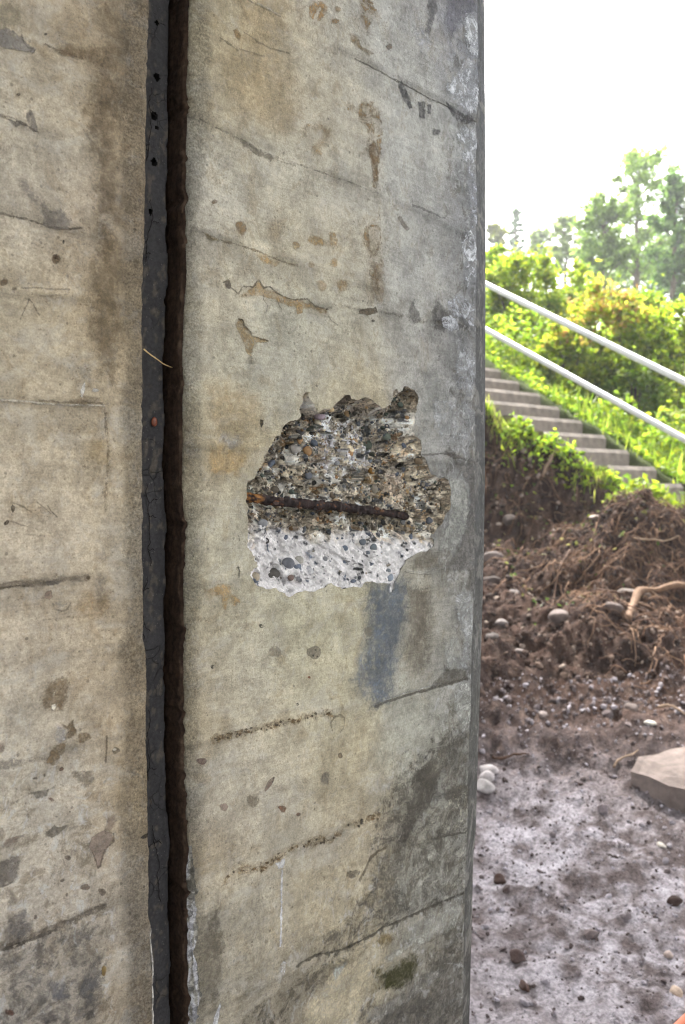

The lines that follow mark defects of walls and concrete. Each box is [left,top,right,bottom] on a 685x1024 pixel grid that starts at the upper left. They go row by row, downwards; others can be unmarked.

peeling [223,280,336,314]
peeling [359,307,377,322]
peeling [433,303,449,332]
corrosion [246,492,411,520]
spalling [247,386,451,597]
damp [252,462,476,1024]
crack [347,846,386,881]
crack [296,893,463,967]